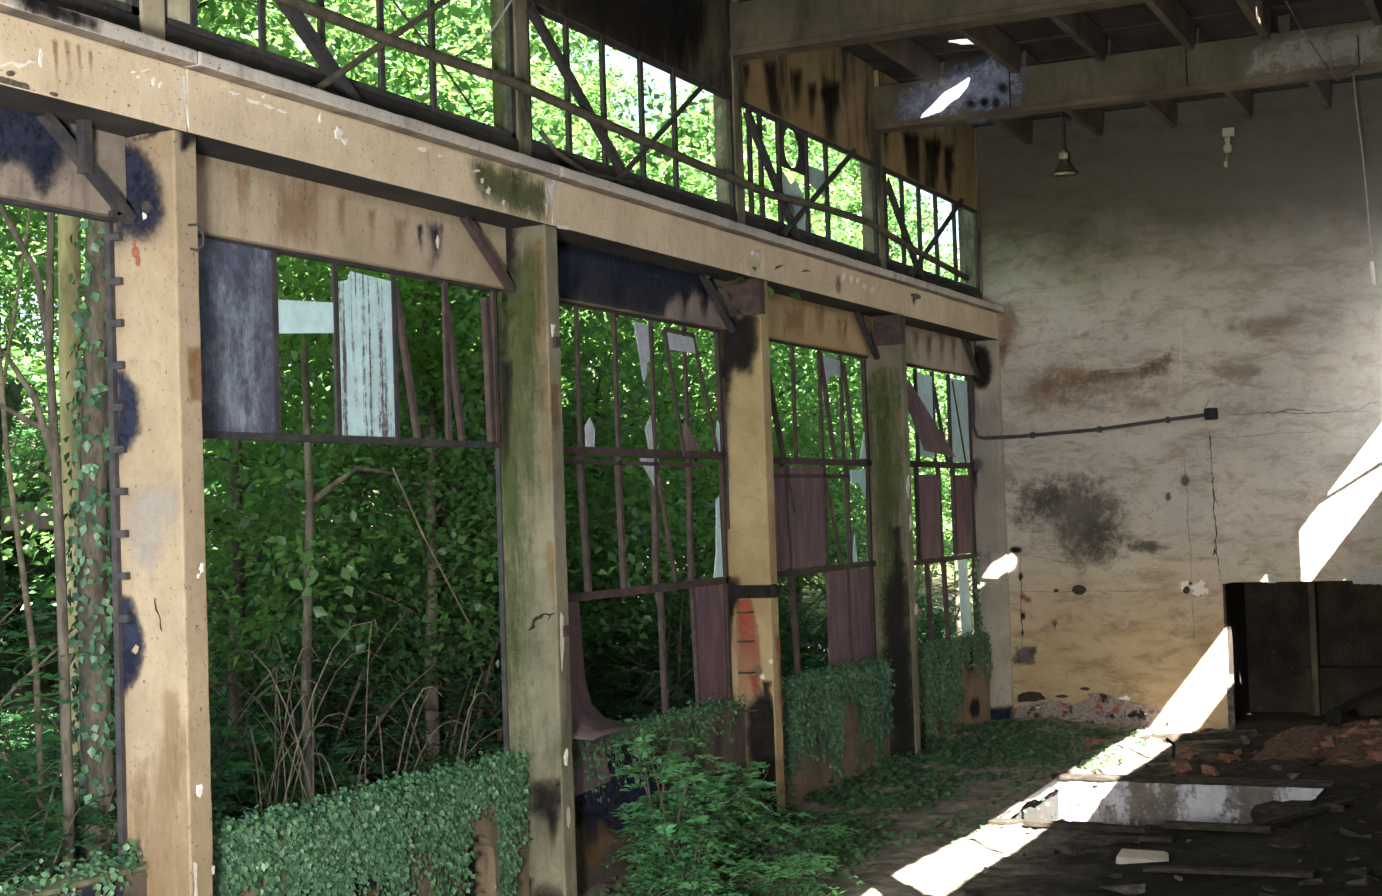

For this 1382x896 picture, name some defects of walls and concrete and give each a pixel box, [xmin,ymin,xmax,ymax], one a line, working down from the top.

damp [790,70,840,139]
damp [924,139,954,192]
damp [1017,473,1166,561]
crack [1166,401,1379,639]
crack [528,613,554,631]
spalling [1014,687,1170,728]